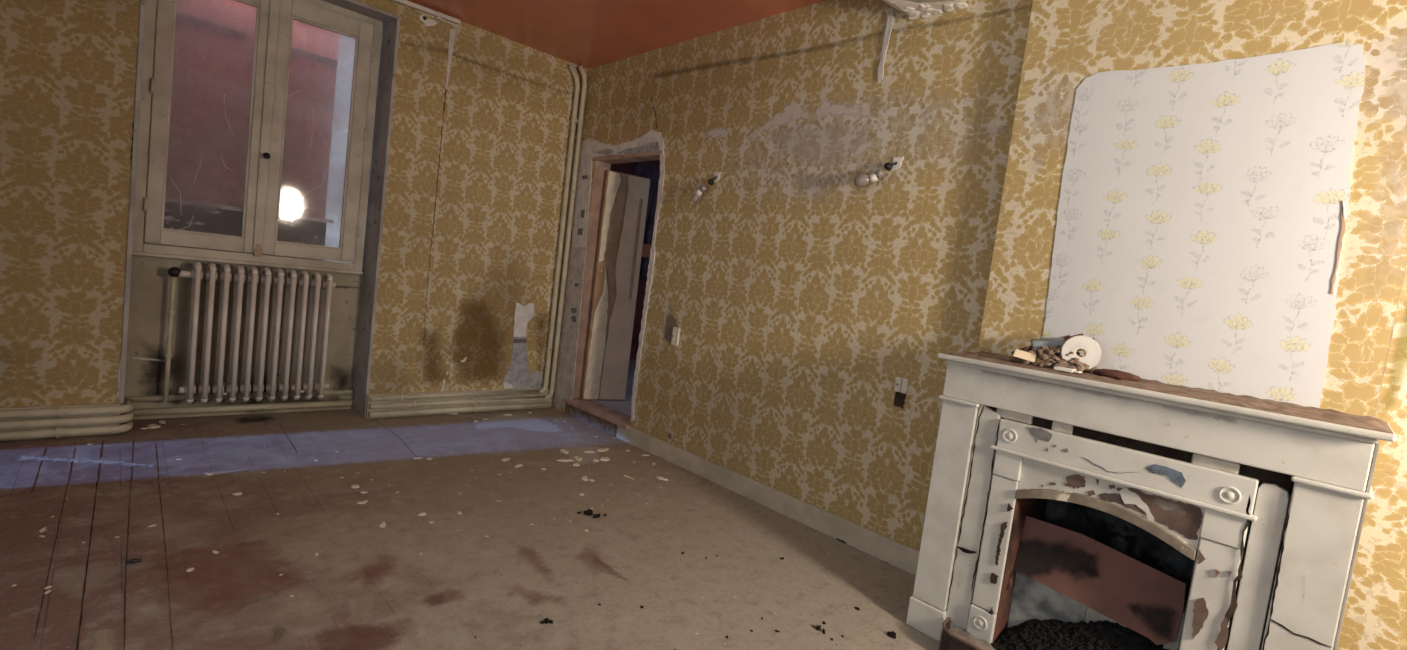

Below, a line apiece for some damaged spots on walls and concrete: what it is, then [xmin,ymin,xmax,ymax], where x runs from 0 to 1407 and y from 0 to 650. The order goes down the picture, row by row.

flaking render [571,130,665,422]
leakage [458,306,498,376]
flaking render [503,302,544,389]